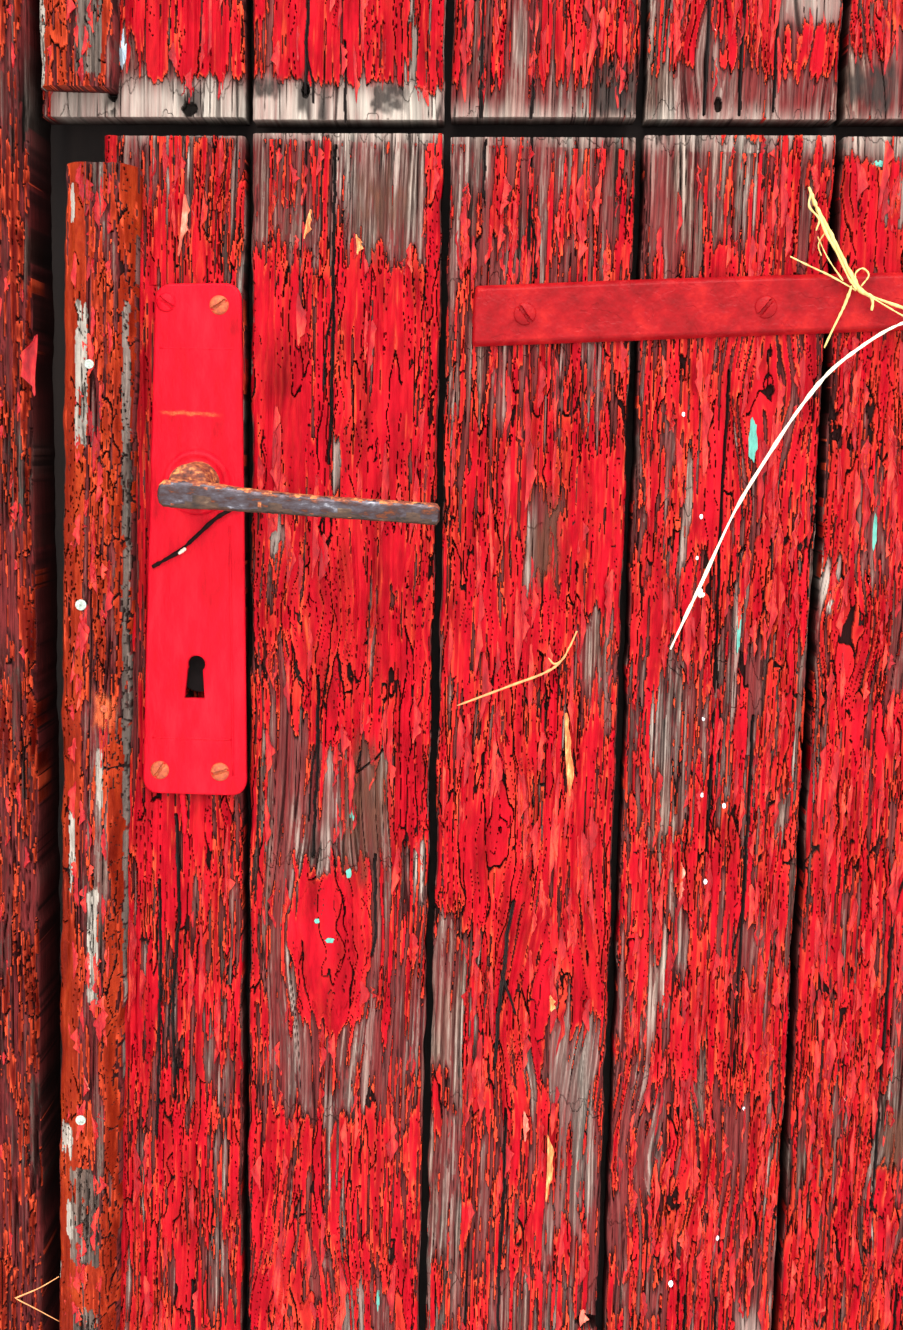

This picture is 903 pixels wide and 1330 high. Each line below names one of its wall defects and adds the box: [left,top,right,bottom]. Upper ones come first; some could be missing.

peeling [0,277,24,316]
peeling [43,0,903,496]
peeling [0,392,21,439]
peeling [9,475,23,532]
peeling [68,306,114,721]
peeling [68,738,77,763]
peeling [5,782,21,846]
peeling [68,781,107,926]
peeling [122,322,903,1330]
peeling [68,941,109,1053]
peeling [67,1075,105,1146]
peeling [64,1175,107,1323]